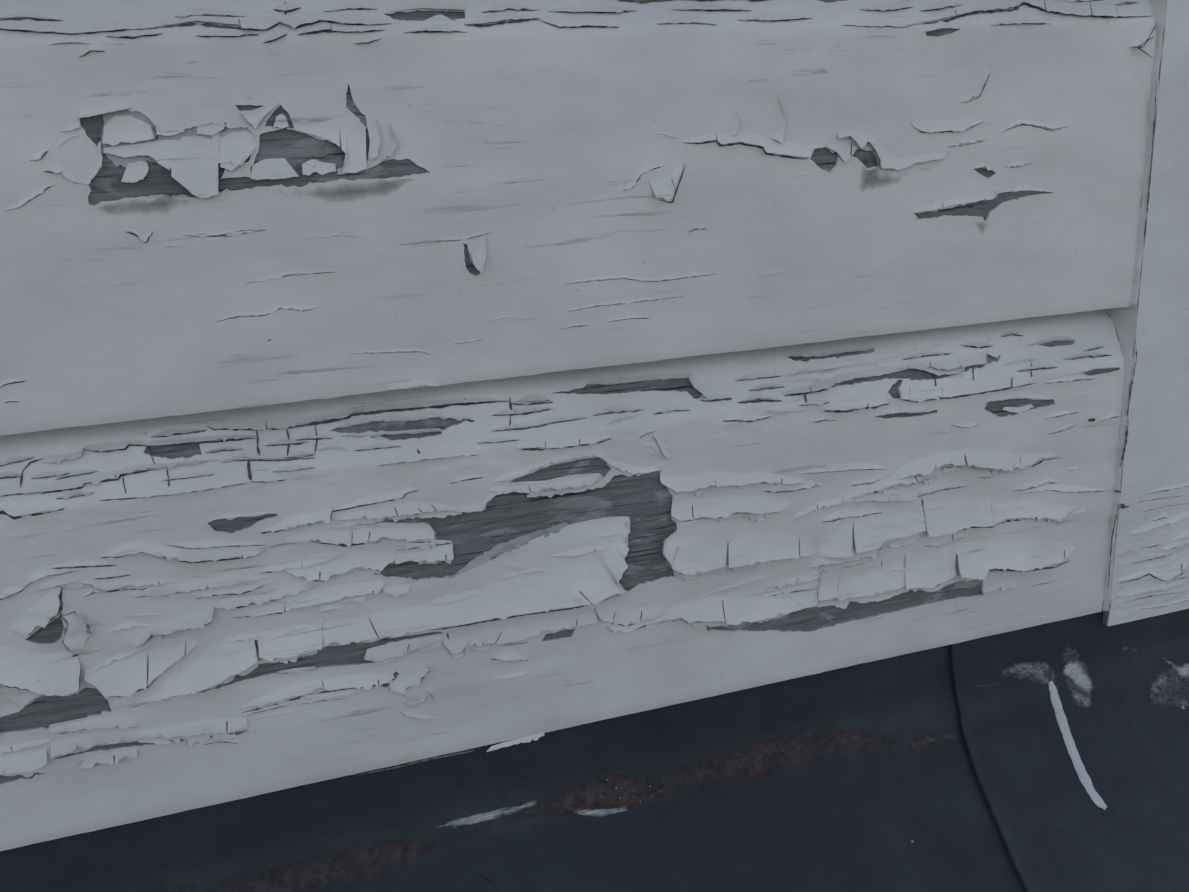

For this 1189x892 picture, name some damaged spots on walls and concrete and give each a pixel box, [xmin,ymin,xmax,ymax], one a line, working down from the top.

peeling [923,19,960,37]
peeling [4,85,428,211]
peeling [605,161,686,203]
peeling [656,95,983,183]
peeling [913,183,1052,220]
peeling [972,161,1030,178]
peeling [0,330,1119,783]
peeling [1116,482,1189,609]